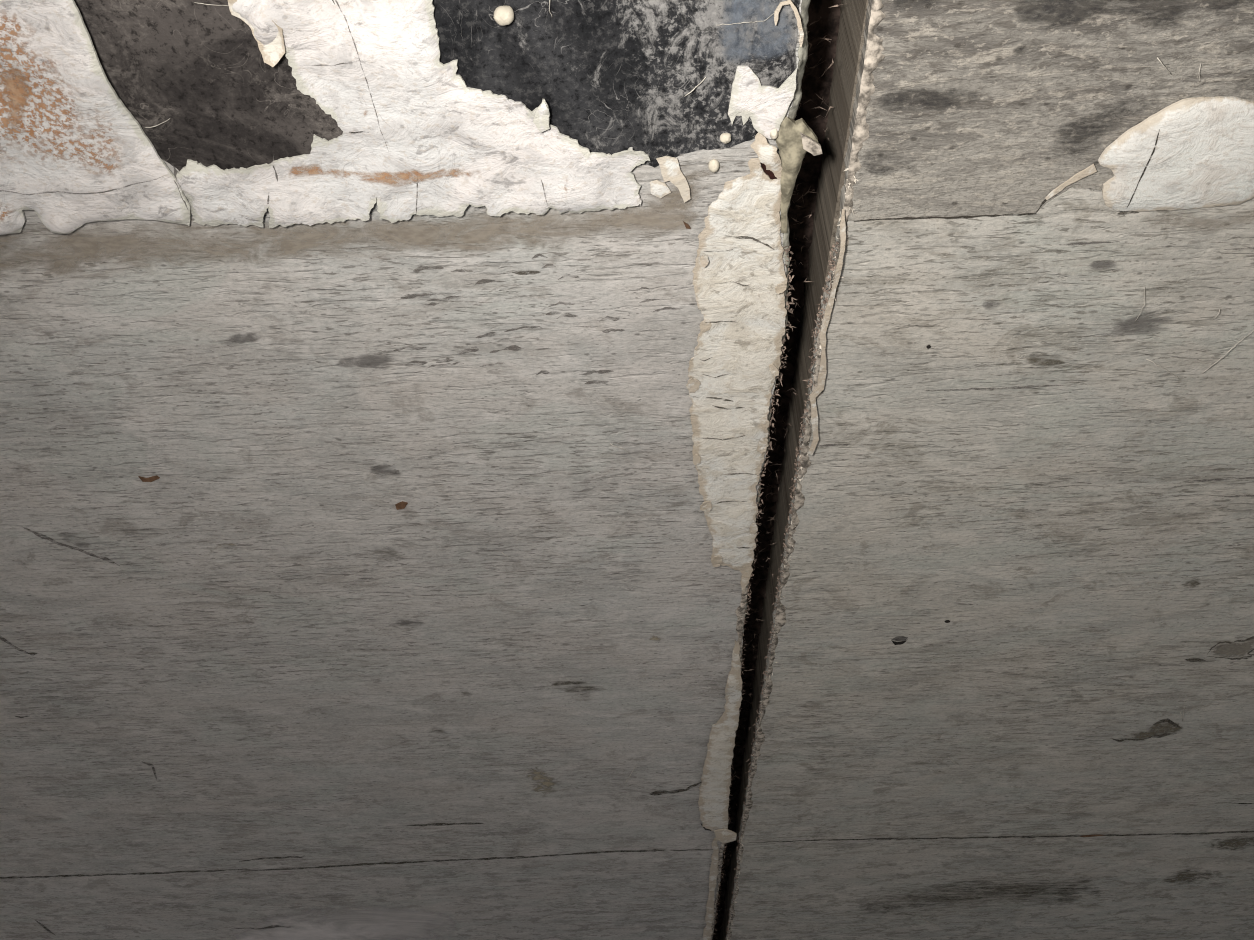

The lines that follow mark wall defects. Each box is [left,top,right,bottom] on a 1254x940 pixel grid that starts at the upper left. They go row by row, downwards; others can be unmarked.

damp [1017,0,1181,26]
corrosion [0,16,117,170]
damp [883,90,958,109]
damp [1058,109,1130,151]
peeling [1098,96,1254,216]
peeling [0,0,886,940]
crack [650,782,701,796]